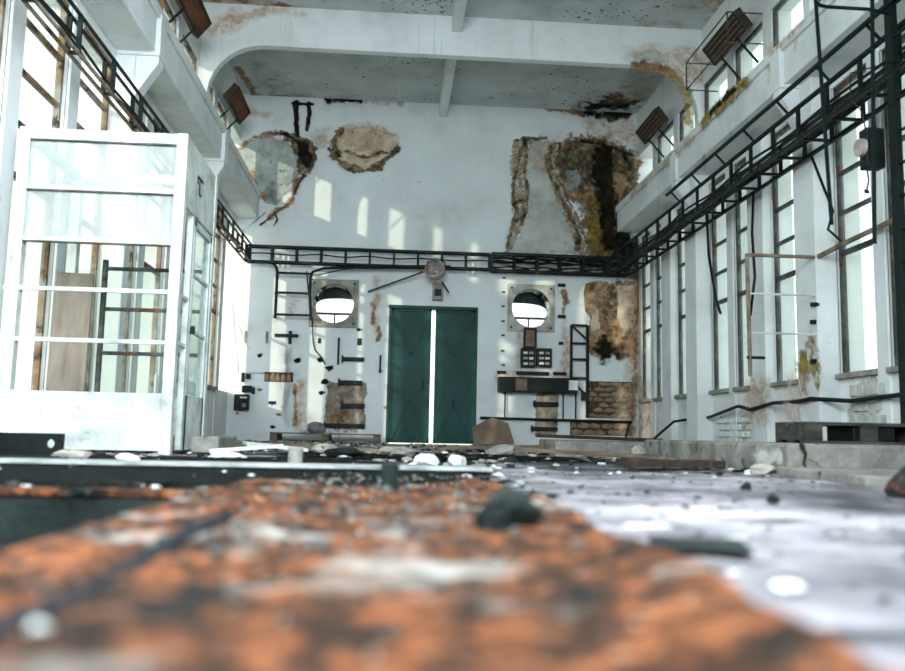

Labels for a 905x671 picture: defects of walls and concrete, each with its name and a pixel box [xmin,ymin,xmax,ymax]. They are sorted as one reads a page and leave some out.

corrosion [208,0,289,31]
spalling [237,126,402,205]
spalling [504,136,592,255]
leakage [546,48,702,269]
spalling [579,279,638,365]